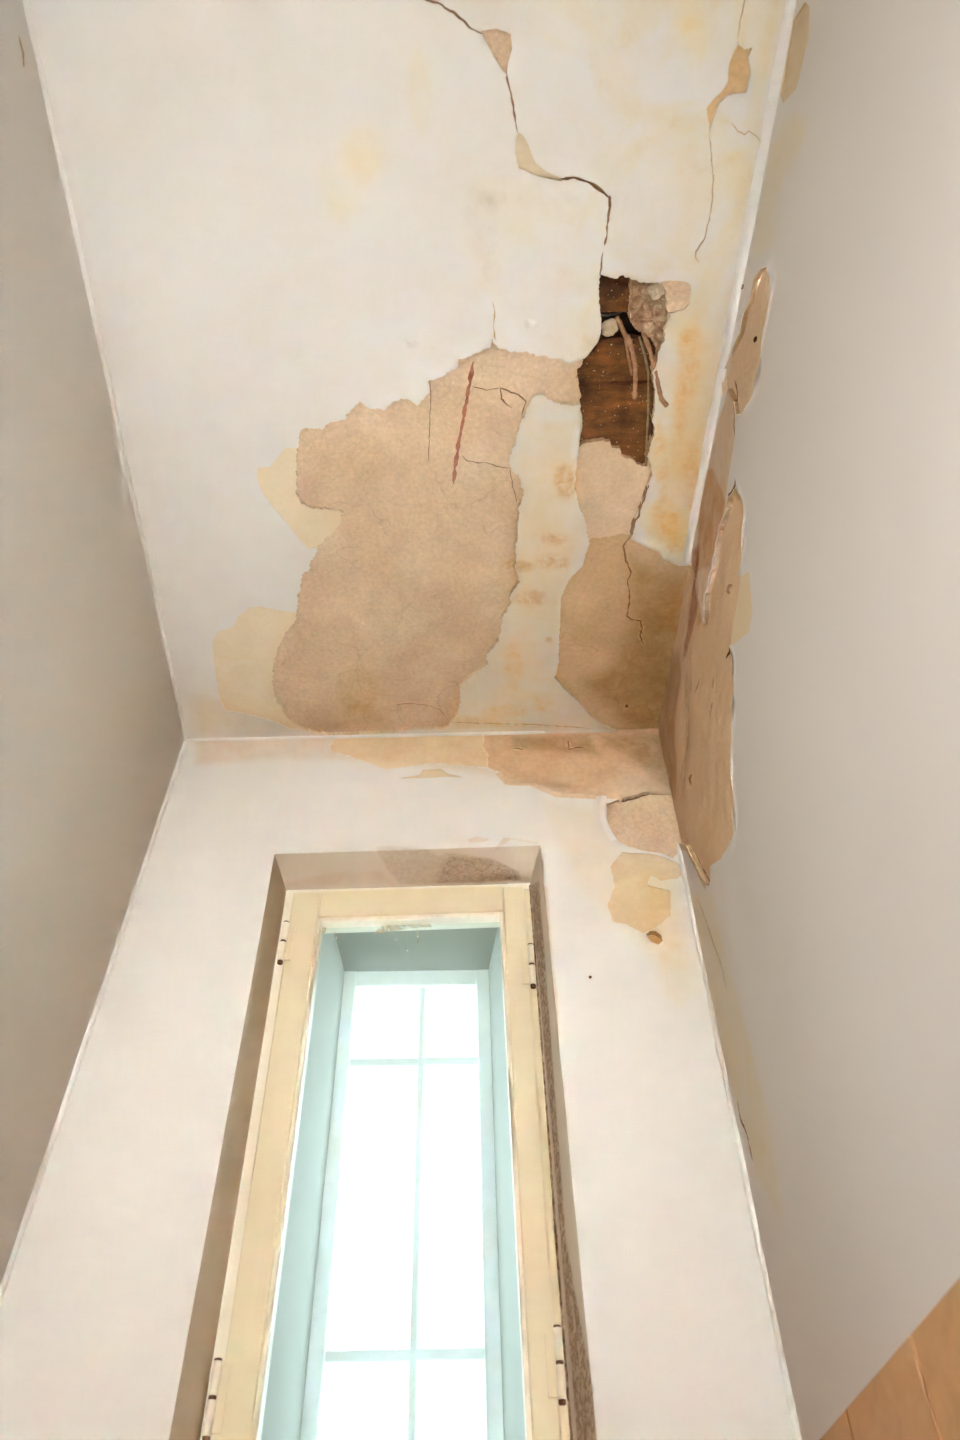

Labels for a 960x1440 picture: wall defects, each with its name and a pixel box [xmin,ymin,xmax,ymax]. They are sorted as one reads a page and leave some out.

crack [425,0,482,34]
crack [506,72,518,133]
crack [561,176,611,274]
crack [695,122,760,262]
flaking render [722,267,770,415]
flaking render [212,278,752,945]